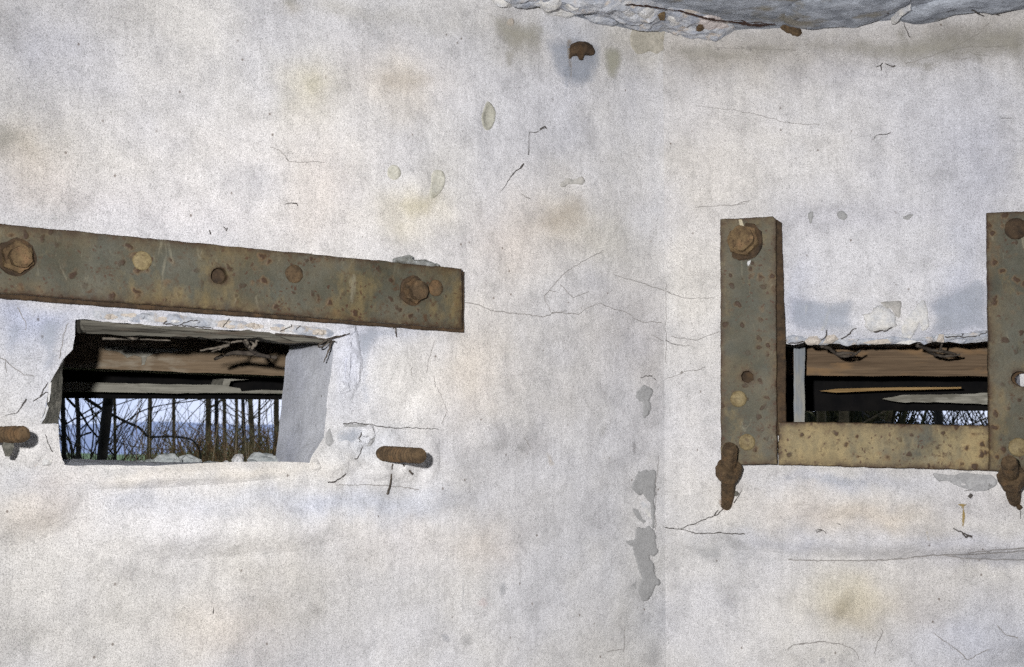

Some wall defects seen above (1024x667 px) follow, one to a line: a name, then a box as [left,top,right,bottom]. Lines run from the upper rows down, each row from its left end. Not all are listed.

spalling [492,0,735,54]
peeling [780,0,1024,37]
crack [464,250,720,380]
spalling [786,301,988,347]
peeling [636,385,653,418]
crack [655,457,745,535]
spalling [933,472,997,499]
peeling [626,469,661,601]